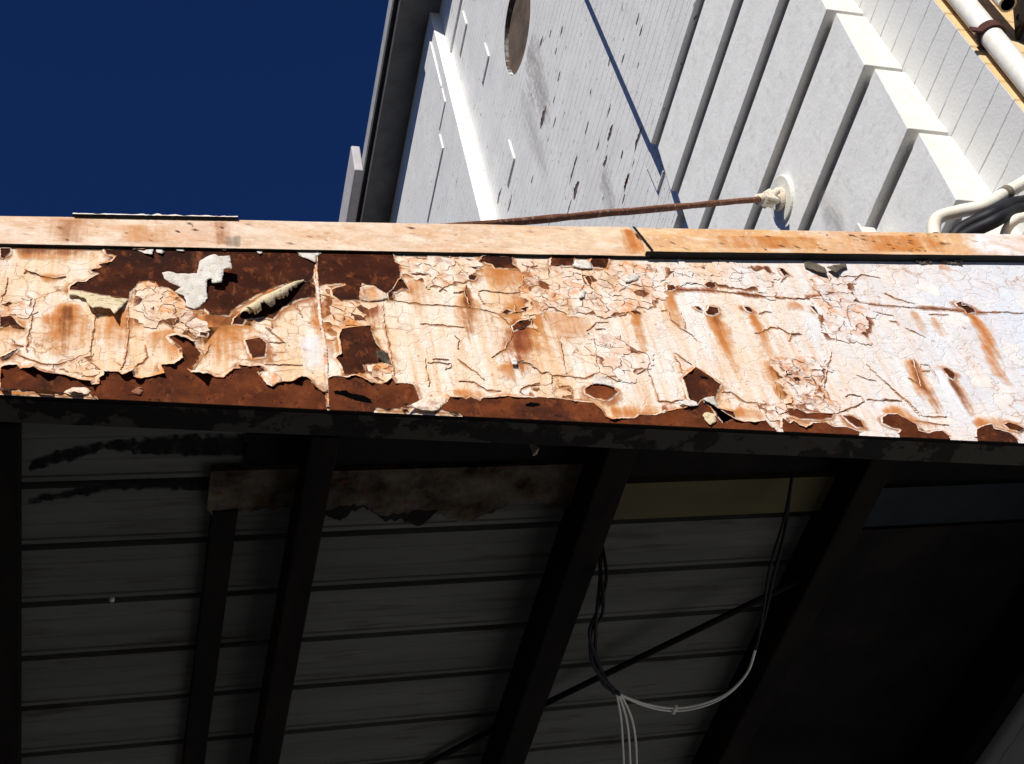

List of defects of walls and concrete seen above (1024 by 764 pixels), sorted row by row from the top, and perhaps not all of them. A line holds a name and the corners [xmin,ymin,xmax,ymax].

corrosion [43,303,84,353]
corrosion [152,312,252,358]
peeling [0,248,868,435]
crack [293,255,965,425]
corrosion [707,316,733,361]
corrosion [912,306,1006,380]
corrosion [907,360,935,401]
peeling [941,366,959,381]
water stain [29,434,248,471]
peeling [878,413,950,439]
peeling [974,420,1024,442]
water stain [28,477,209,504]